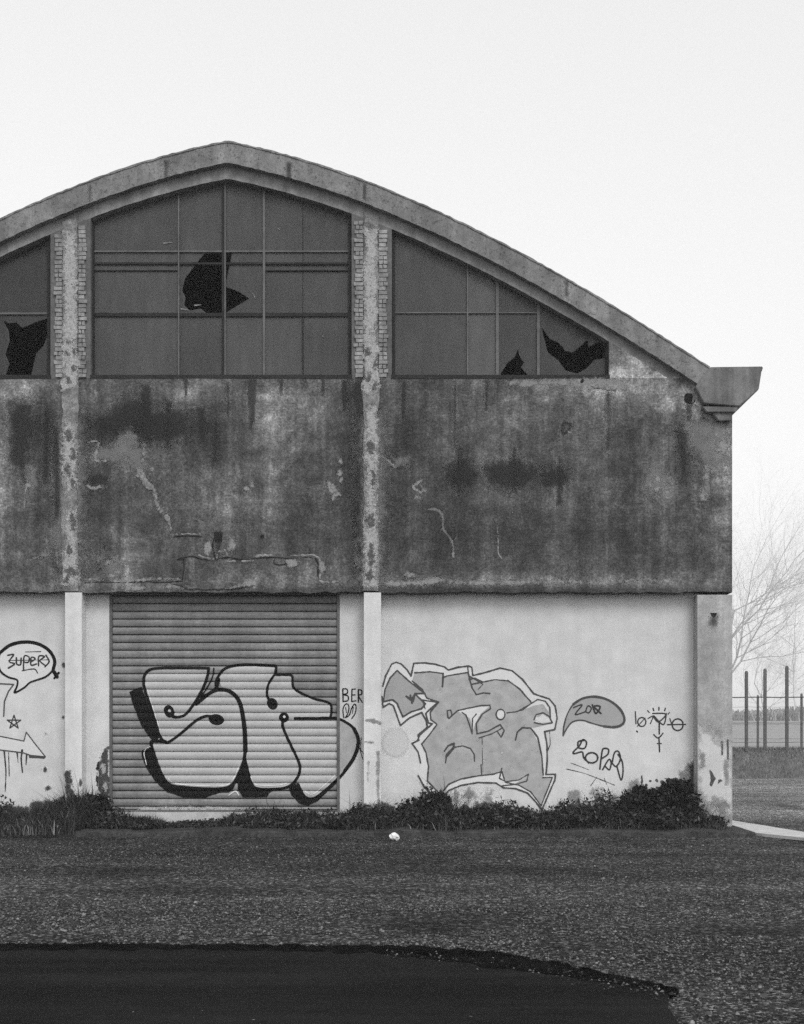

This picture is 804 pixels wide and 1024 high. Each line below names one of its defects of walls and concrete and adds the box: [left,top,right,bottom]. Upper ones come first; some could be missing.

damp [45,416,59,514]
damp [490,461,532,486]
crack [428,508,455,558]
peeling [698,727,732,824]